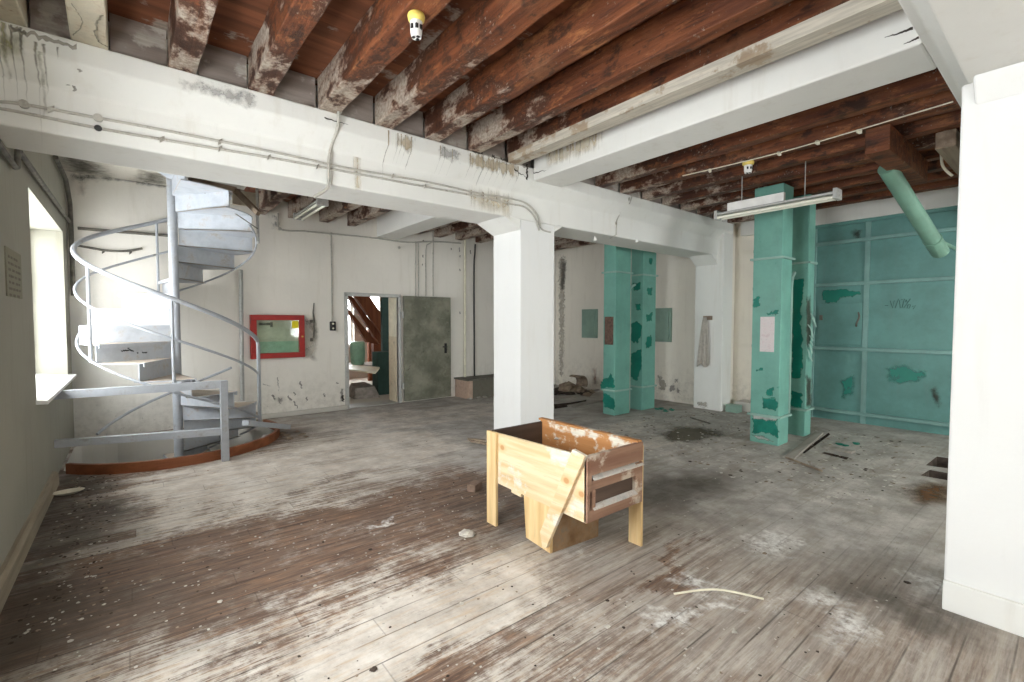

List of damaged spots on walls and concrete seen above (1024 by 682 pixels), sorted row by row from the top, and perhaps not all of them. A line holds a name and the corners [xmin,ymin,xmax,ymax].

water stain [1,22,58,75]
water stain [202,83,252,105]
water stain [388,130,412,150]
water stain [440,146,519,175]
peeling [822,289,861,303]
peeling [630,282,653,381]
peeling [752,279,817,441]
peeling [888,366,925,383]